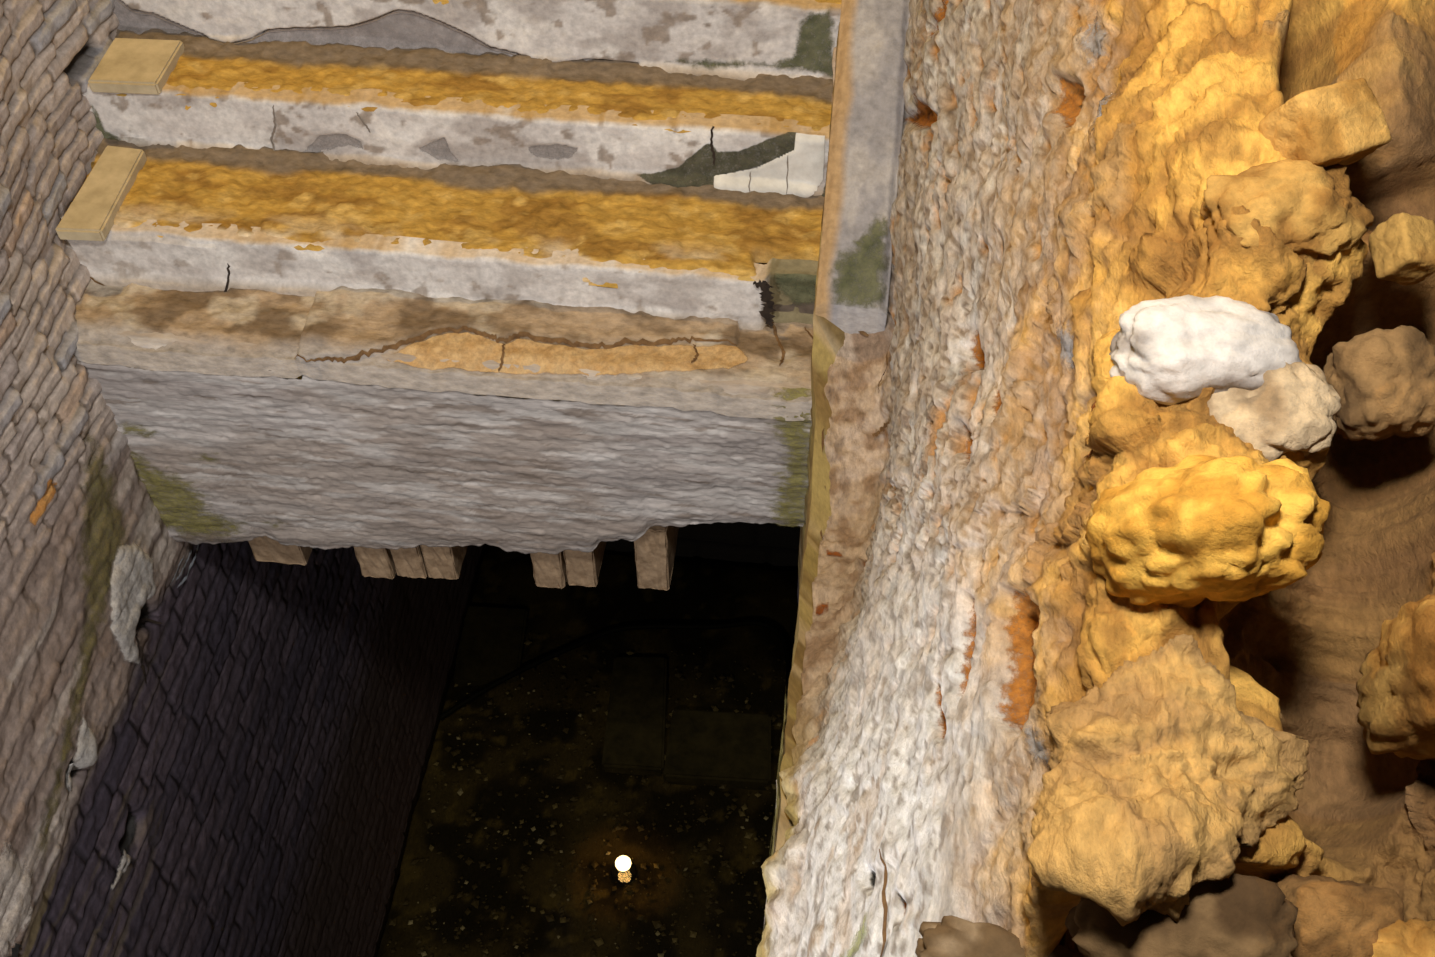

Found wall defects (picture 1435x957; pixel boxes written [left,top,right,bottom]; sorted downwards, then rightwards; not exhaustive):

flaking render [113,0,518,57]
crack [294,326,737,363]
crack [753,280,813,366]